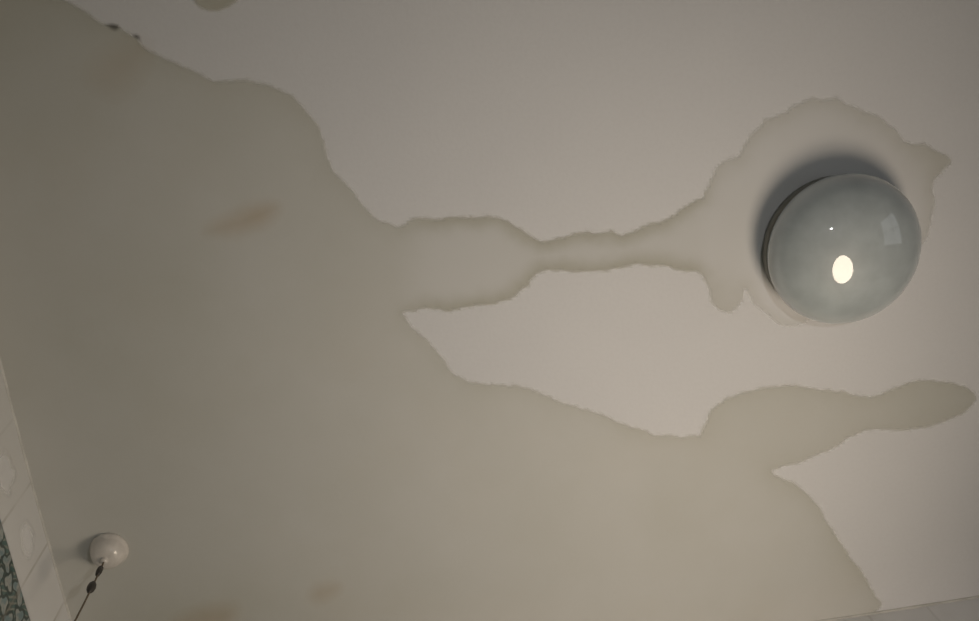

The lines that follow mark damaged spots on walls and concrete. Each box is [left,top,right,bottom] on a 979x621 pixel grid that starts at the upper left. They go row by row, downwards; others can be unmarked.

leakage [196,0,236,10]
leakage [395,191,706,318]
leakage [703,98,951,326]
leakage [701,381,976,471]
leakage [0,369,69,621]